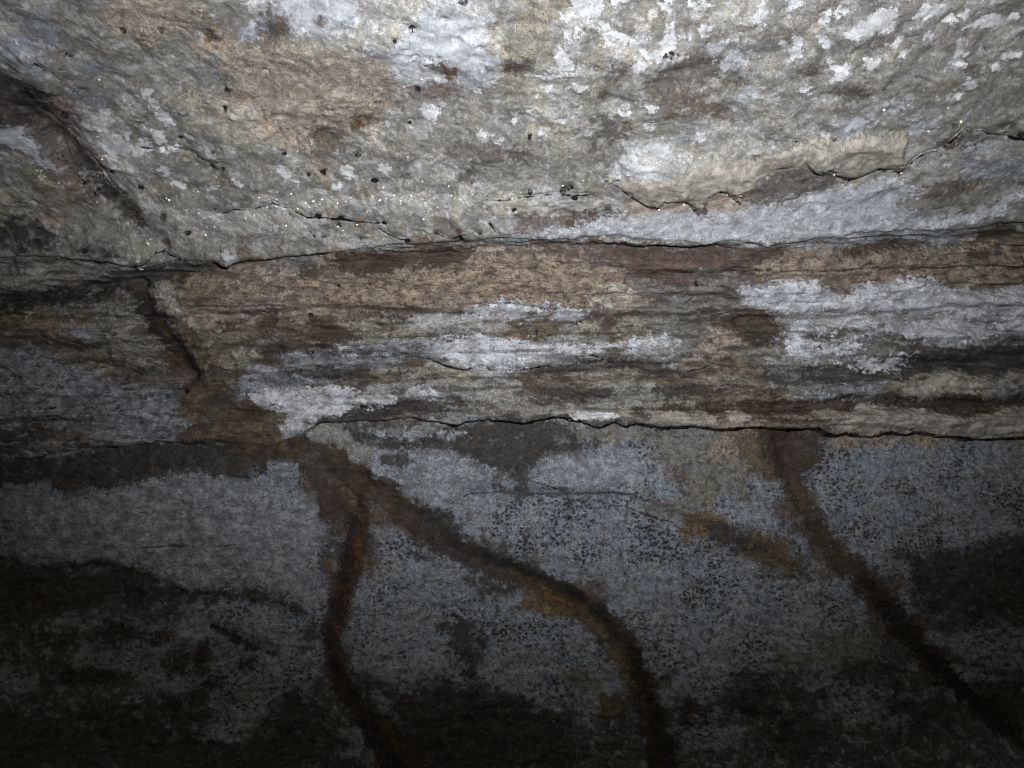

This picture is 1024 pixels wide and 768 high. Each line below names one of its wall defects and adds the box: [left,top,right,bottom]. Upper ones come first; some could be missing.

crack [808,130,1024,182]
crack [131,250,181,268]
crack [420,416,1024,440]
damp [0,271,1024,768]